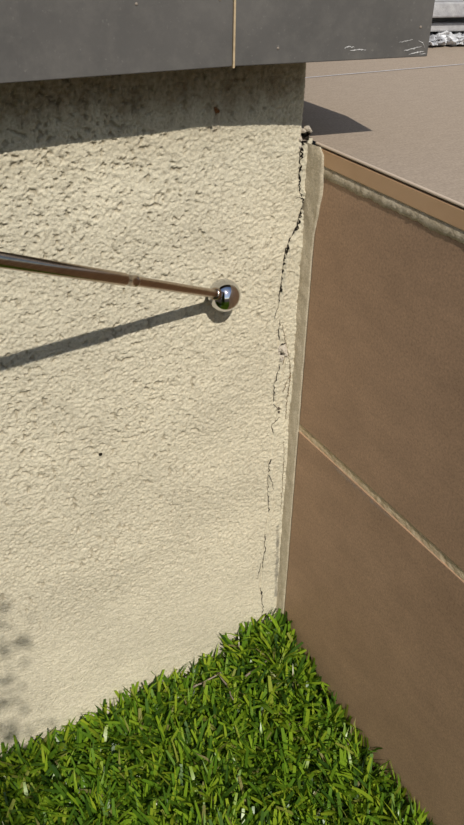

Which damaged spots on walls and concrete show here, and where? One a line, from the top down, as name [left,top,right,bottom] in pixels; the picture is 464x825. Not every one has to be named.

crack [267,137,310,512]
crack [257,537,266,622]